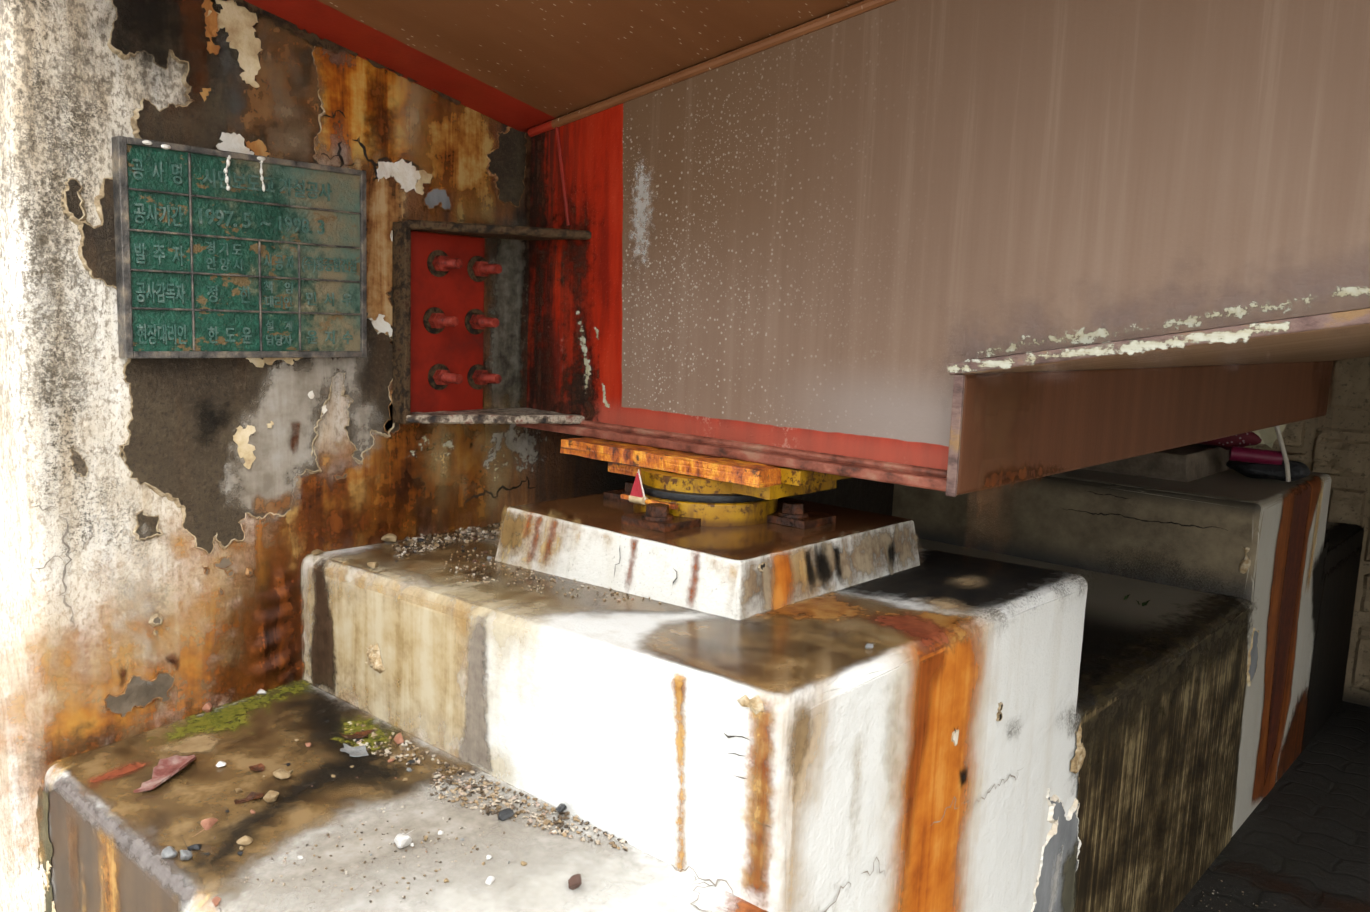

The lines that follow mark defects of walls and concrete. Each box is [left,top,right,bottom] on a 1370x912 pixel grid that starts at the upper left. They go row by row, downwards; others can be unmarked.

peeling [107,0,325,164]
peeling [61,176,117,290]
corrosion [313,38,495,337]
peeling [376,159,452,213]
corrosion [520,126,599,421]
peeling [947,294,1313,373]
peeling [119,287,400,596]
corrosion [100,834,118,912]
corrosion [673,674,685,870]
corrosion [728,524,981,912]
peeling [1030,788,1081,912]
corrosion [1252,476,1323,802]